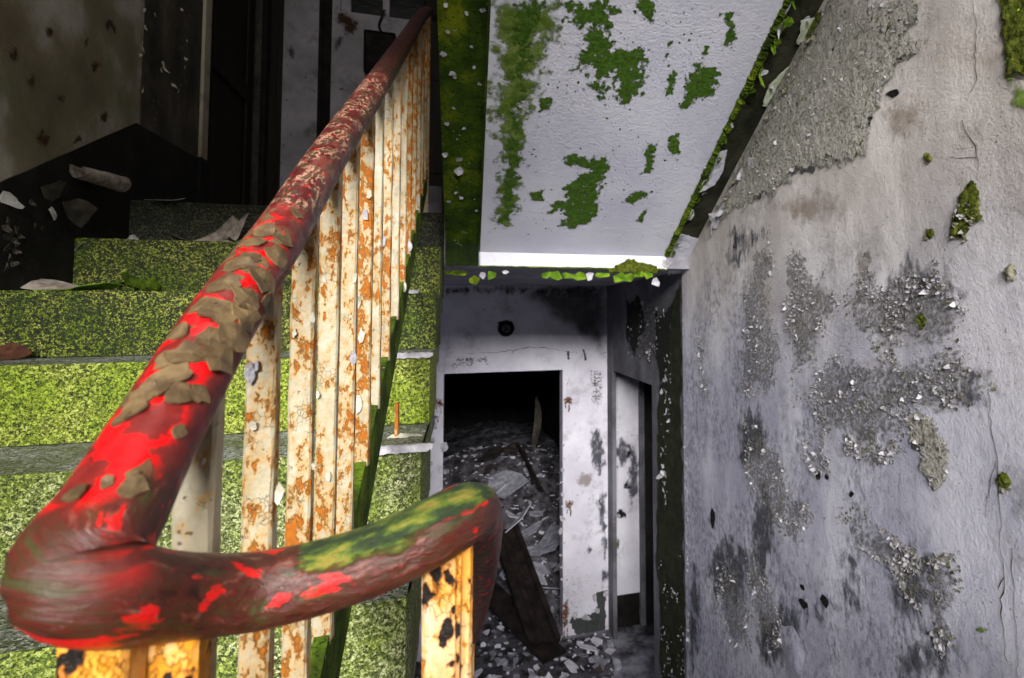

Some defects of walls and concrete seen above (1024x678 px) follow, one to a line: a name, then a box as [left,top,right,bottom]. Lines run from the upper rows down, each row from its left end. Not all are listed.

flaking render [708,0,929,237]
peeling [110,222,294,427]
peeling [626,301,671,363]
water stain [591,429,639,497]
water stain [687,481,776,673]
water stain [737,404,768,468]
water stain [756,604,824,667]
peeling [737,230,997,669]
crack [986,393,1019,678]